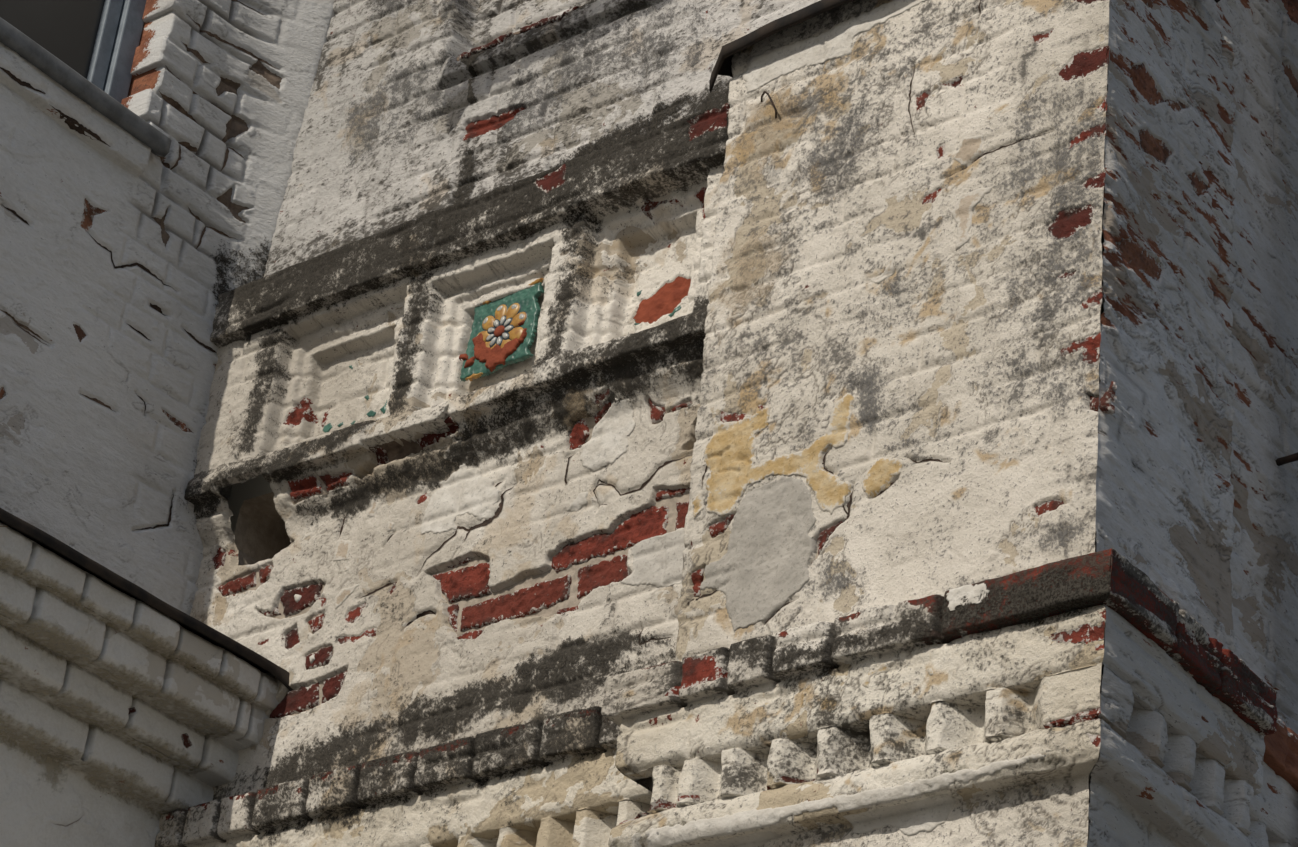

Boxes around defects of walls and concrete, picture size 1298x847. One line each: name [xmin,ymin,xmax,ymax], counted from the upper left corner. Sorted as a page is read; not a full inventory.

flaking render [1059,45,1109,83]
flaking render [1129,63,1188,112]
flaking render [1047,171,1106,240]
damp [172,0,740,529]
flaking render [633,276,691,324]
crack [564,455,707,507]
crack [359,482,517,599]
spalling [431,488,705,640]
spalling [815,521,843,560]
spalling [259,582,377,719]
crack [405,610,436,628]
damp [242,626,675,847]